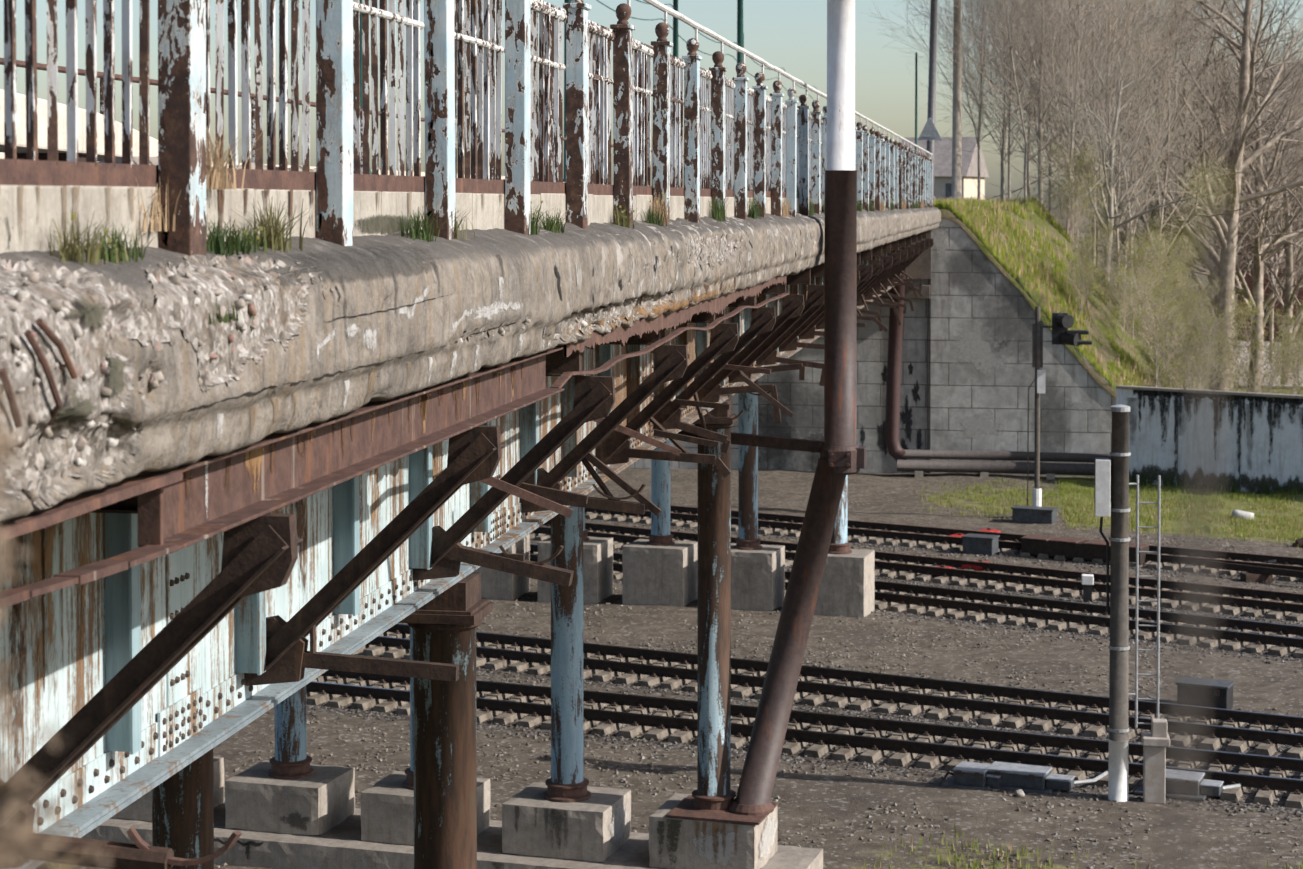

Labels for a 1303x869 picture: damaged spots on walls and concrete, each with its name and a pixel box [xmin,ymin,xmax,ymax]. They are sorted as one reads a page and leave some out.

peeling [160,56,170,85]
peeling [316,0,335,243]
spalling [0,105,334,511]
rust [566,278,736,339]
rust [408,362,523,480]
leakage [1130,388,1303,472]
rust [272,499,307,589]
rust [359,468,381,538]
rust [6,513,105,764]
rust [140,559,155,640]